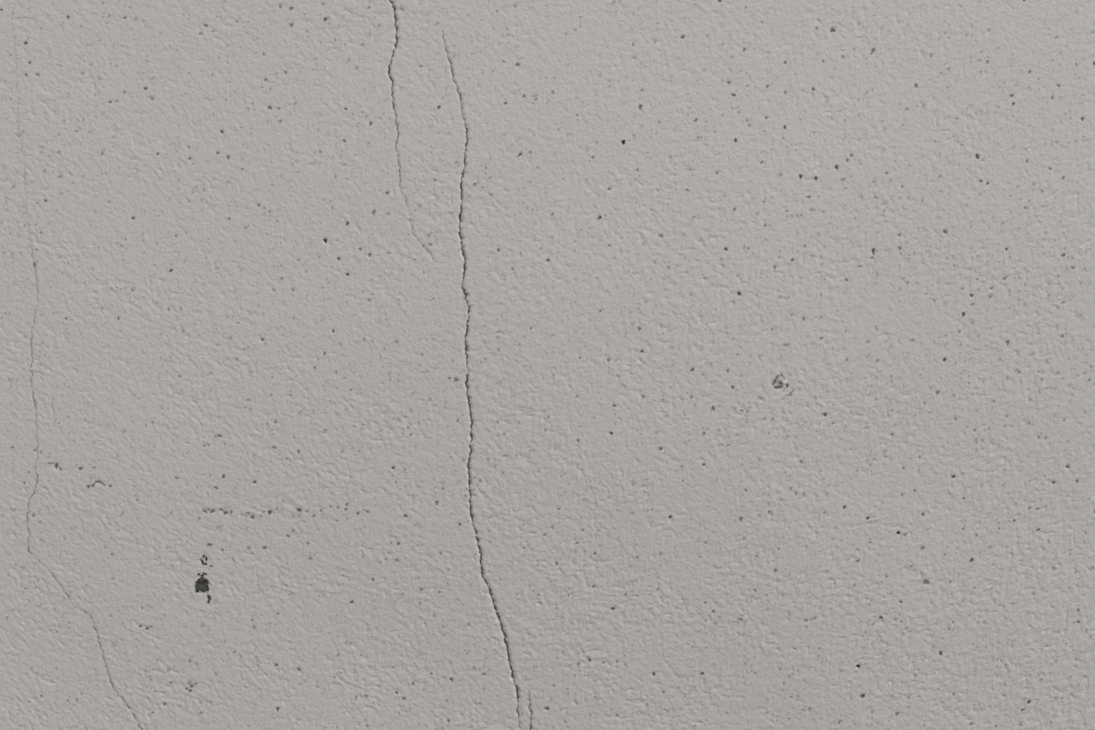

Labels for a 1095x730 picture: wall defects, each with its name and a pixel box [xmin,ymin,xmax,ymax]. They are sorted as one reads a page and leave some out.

crack [388,0,399,138]
crack [445,49,532,730]